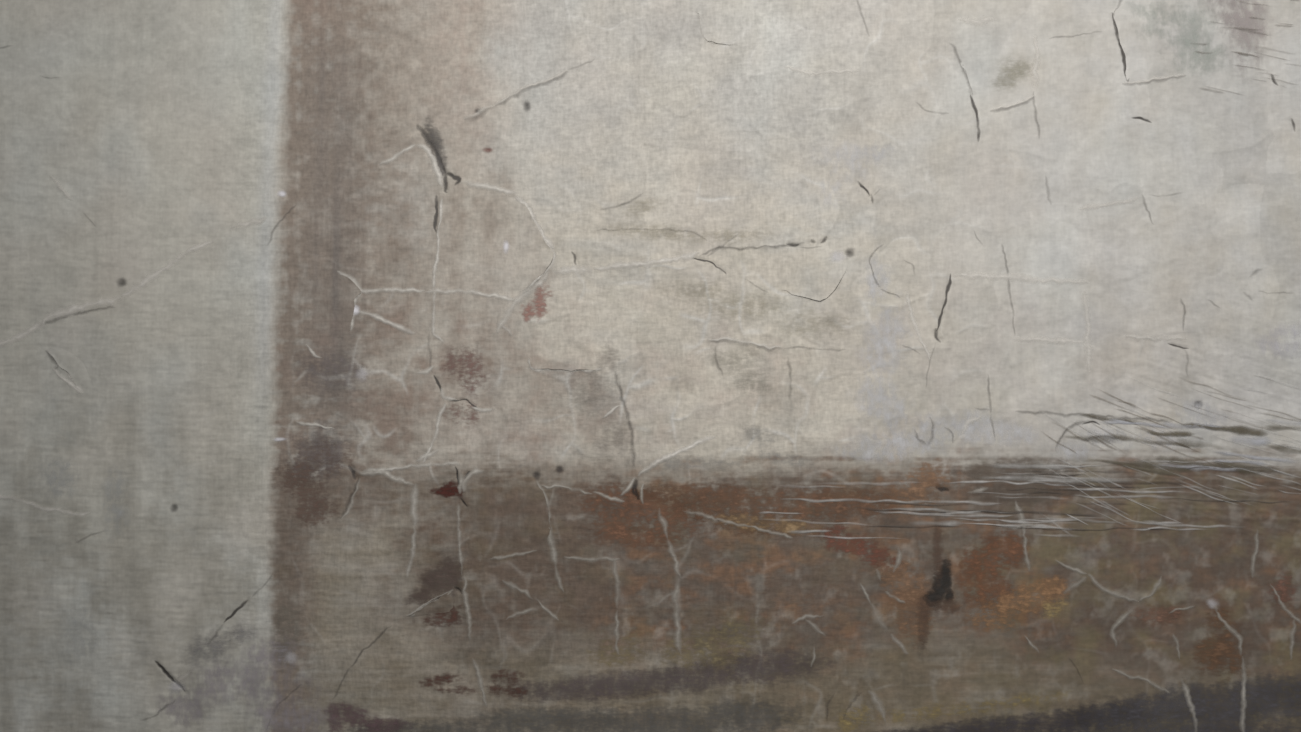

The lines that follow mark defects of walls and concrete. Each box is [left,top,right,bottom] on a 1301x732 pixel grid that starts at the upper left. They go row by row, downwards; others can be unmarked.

crack [1113,19,1168,83]
crack [907,275,951,355]
crack [298,421,331,429]
crack [345,130,719,647]
rust [431,482,462,498]
crack [706,516,790,538]
rust [674,484,895,564]
crack [794,615,821,663]
crack [1016,505,1246,729]
crack [1252,536,1299,654]
water stain [491,655,808,732]
water stain [910,680,1301,732]